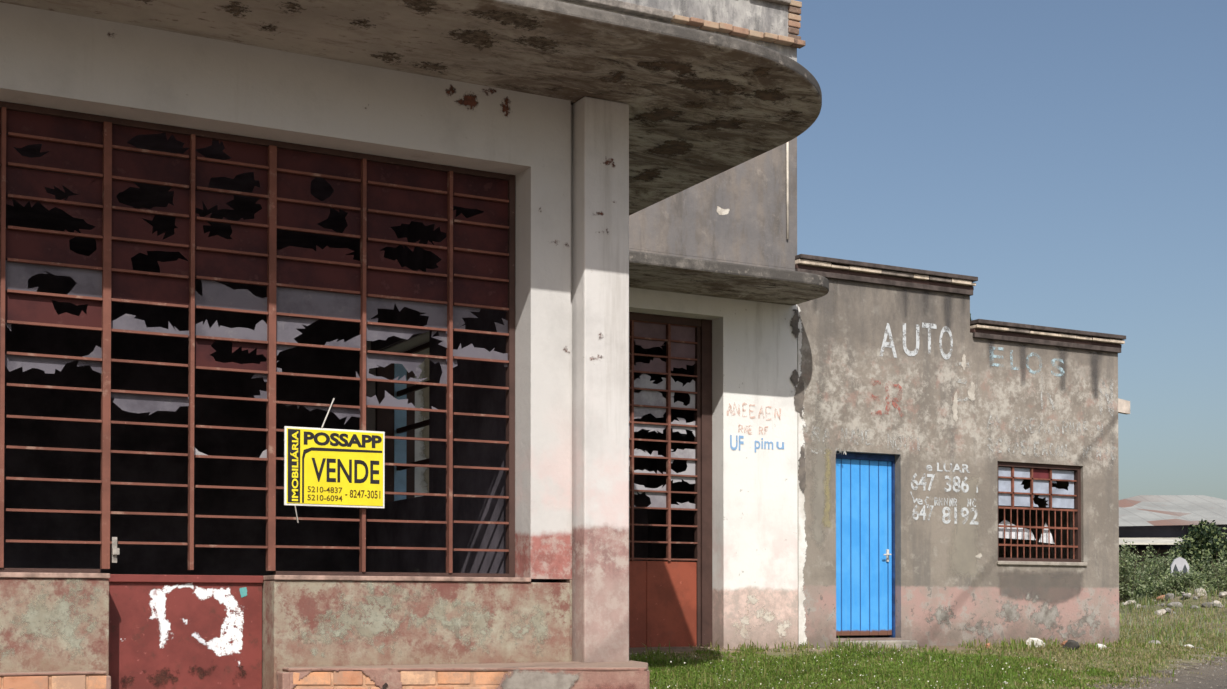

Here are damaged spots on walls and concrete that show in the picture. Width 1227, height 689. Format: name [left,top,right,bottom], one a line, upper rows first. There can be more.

peeling [302,582,491,656]
water stain [925,571,1100,639]
flaking render [293,671,380,689]
flaking render [400,669,579,689]